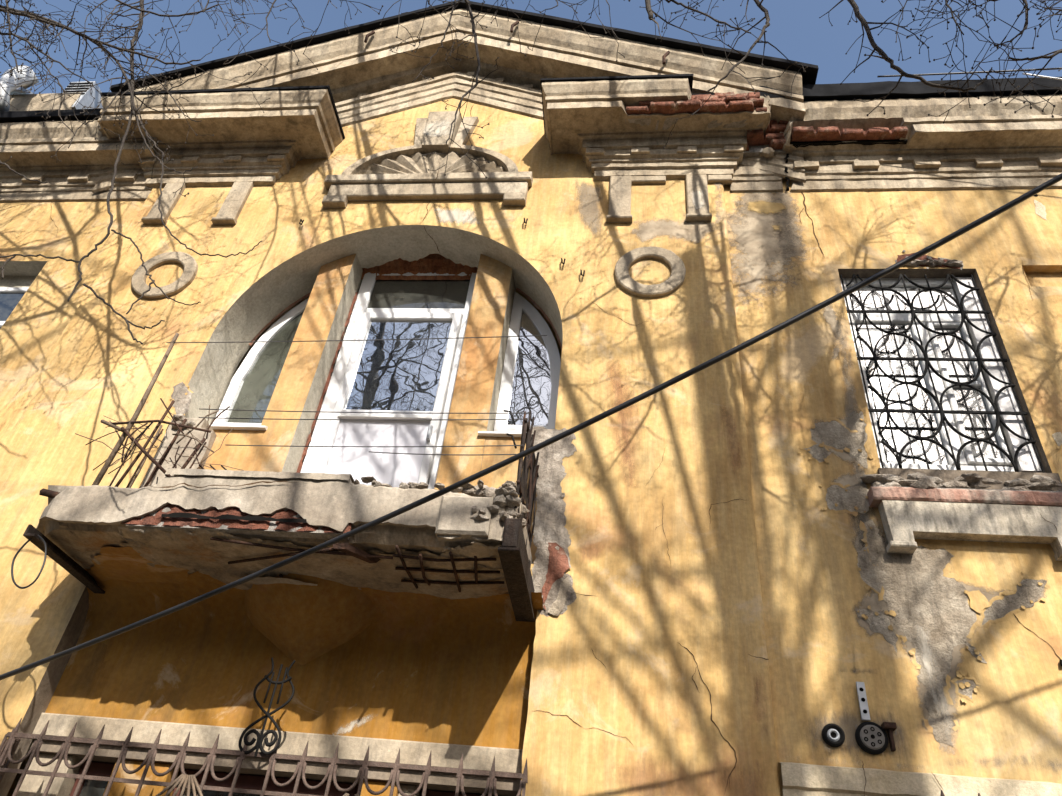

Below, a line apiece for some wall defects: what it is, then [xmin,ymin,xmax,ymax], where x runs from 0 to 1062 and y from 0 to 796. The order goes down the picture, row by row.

peeling [632,192,806,304]
crack [784,154,824,256]
spalling [118,503,509,599]
spalling [354,426,577,617]
spalling [797,408,1051,749]
crack [679,643,737,794]